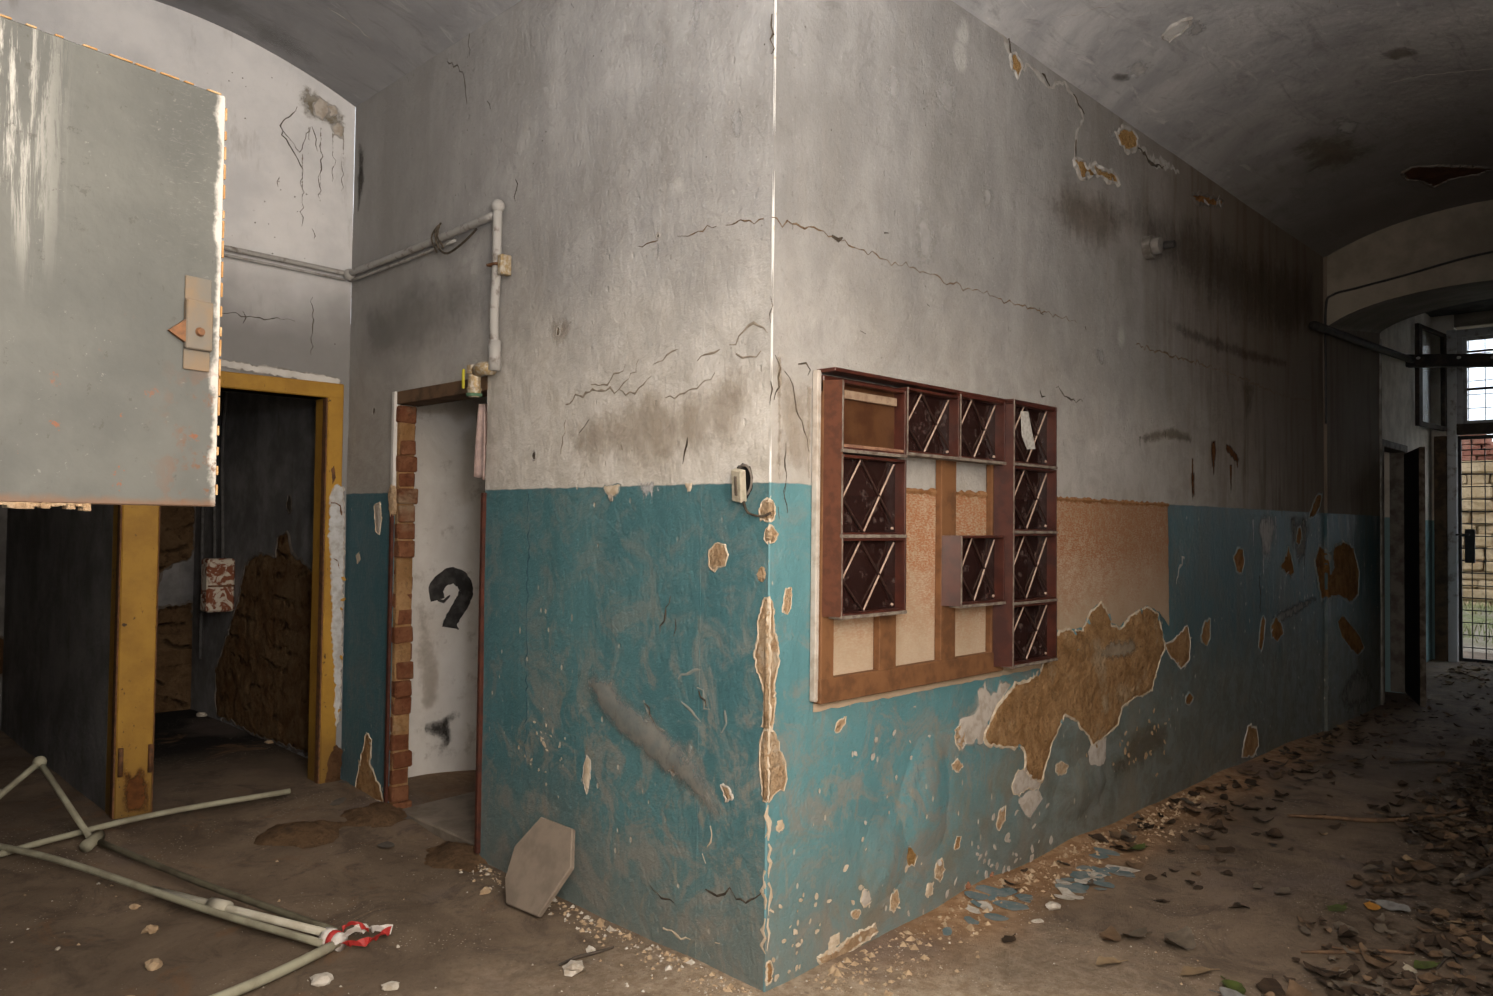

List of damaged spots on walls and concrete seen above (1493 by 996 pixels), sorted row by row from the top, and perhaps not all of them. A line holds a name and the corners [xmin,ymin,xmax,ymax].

crack [768,14,776,54]
crack [277,107,344,238]
crack [222,297,314,350]
crack [639,217,1086,329]
crack [560,299,811,514]
spalling [155,600,193,713]
spalling [159,506,196,584]
spalling [214,530,312,757]
peeling [327,466,361,727]
peeling [708,542,729,572]
spalling [753,566,879,986]
spalling [905,601,1211,936]